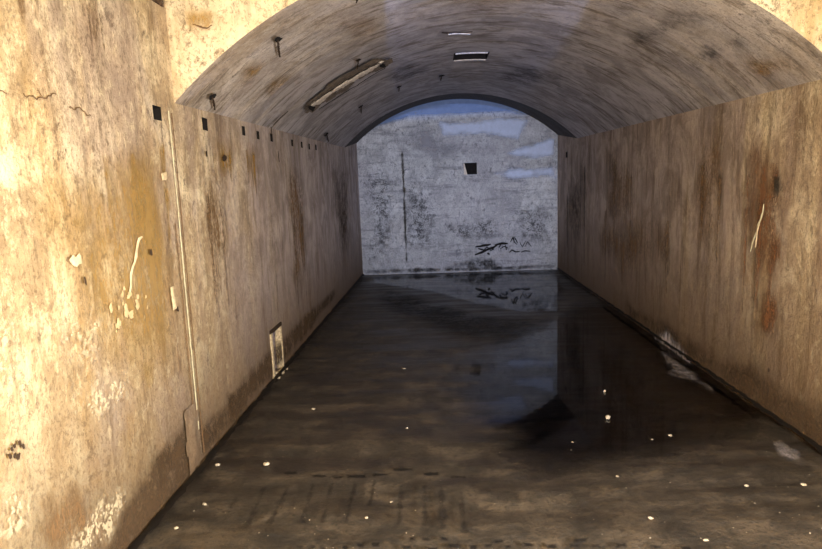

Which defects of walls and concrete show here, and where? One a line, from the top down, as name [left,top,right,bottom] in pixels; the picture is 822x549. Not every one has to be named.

crack [0,90,91,116]
flaking render [109,236,148,332]
corrosion [743,151,780,332]
leakage [197,293,334,452]
leakage [45,432,190,549]